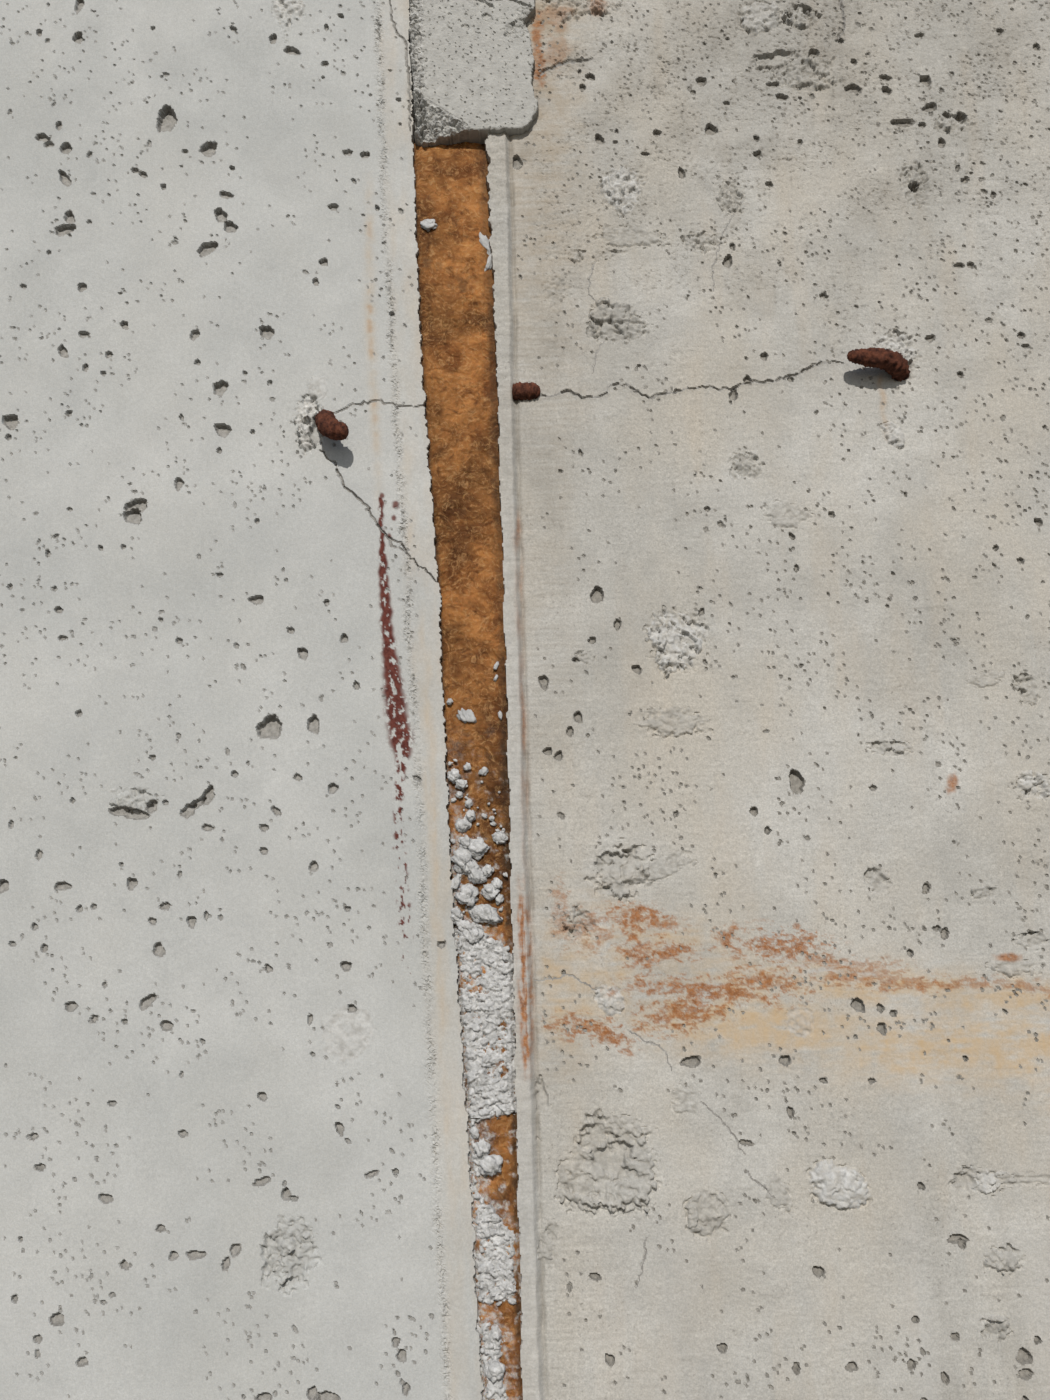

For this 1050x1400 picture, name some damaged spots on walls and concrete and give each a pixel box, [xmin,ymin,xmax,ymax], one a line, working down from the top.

spalling [412,90,469,148]
crack [587,261,599,301]
corrosion [315,409,349,441]
crack [334,399,425,414]
corrosion [512,382,541,401]
crack [539,341,844,400]
corrosion [847,347,911,382]
crack [320,451,436,582]
corrosion [377,489,417,996]
corrosion [512,508,1050,1134]